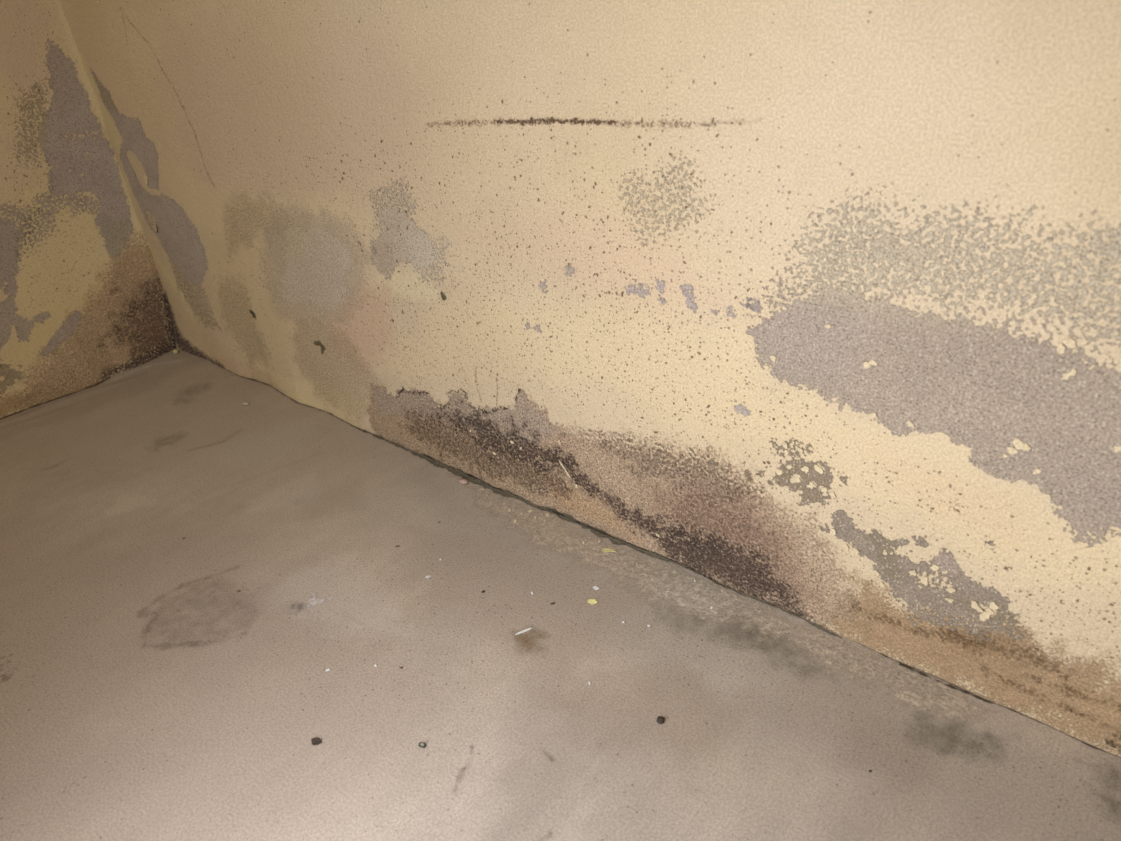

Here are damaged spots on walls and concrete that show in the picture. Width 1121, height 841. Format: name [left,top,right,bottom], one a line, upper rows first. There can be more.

peeling [0,37,222,395]
water stain [0,221,224,417]
peeling [369,179,452,300]
water stain [547,178,640,333]
peeling [624,279,669,305]
peeling [679,184,1121,548]
water stain [291,292,985,720]
peeling [744,438,1032,642]